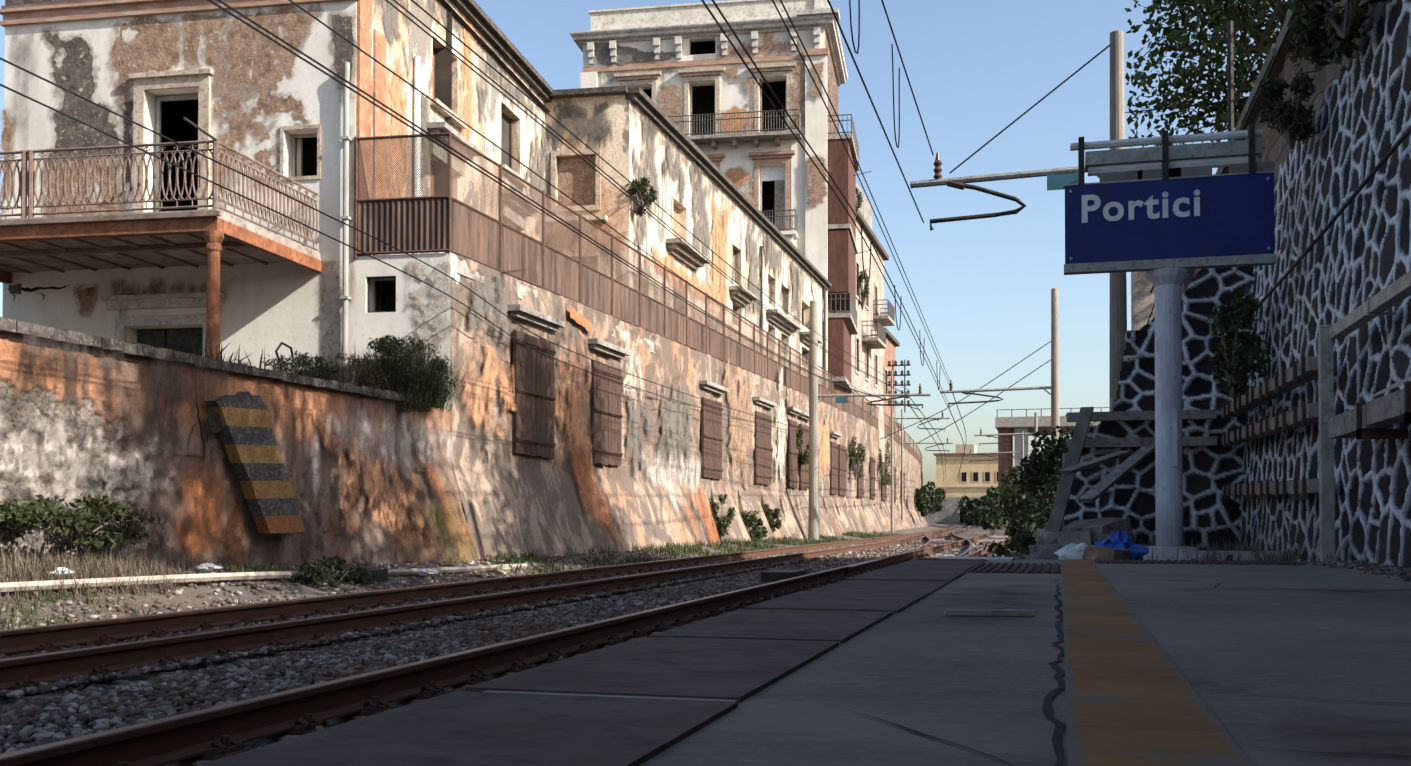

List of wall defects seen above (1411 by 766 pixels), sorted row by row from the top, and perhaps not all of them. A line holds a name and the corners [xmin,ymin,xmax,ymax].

peeling [41,4,357,217]
peeling [371,0,732,334]
spalling [0,419,173,535]
rust [184,467,223,559]
rust [422,459,474,558]
rust [571,453,621,542]